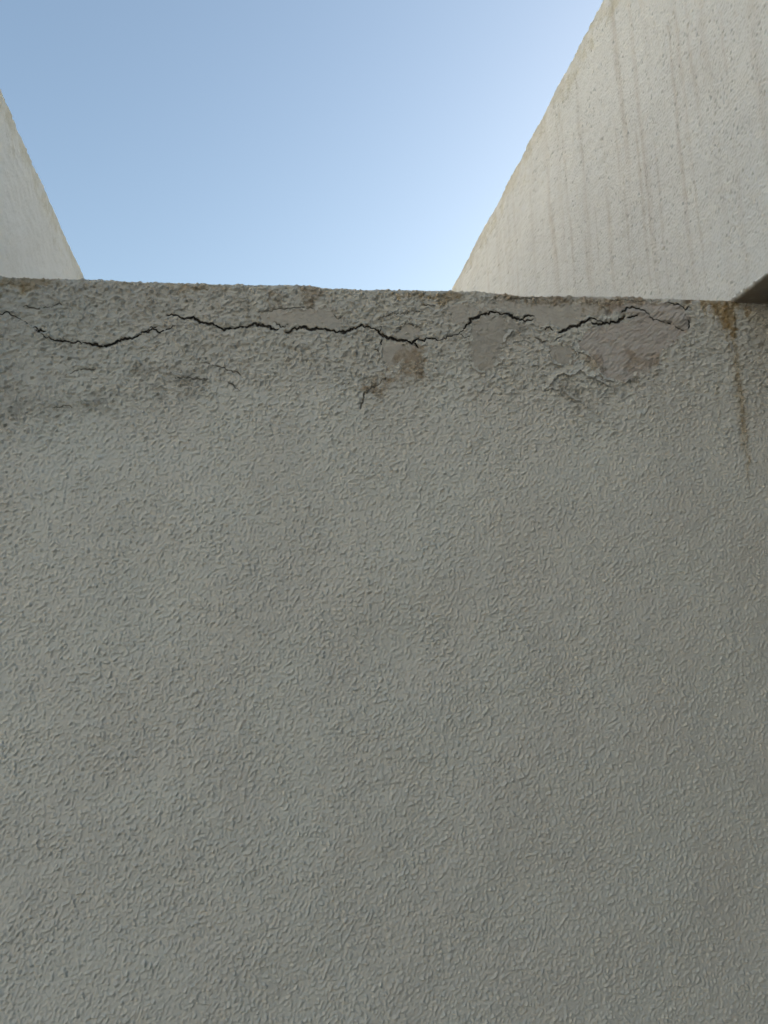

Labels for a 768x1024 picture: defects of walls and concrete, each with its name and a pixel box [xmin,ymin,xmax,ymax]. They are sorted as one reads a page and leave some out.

crack [0,297,691,375]
peeling [377,319,425,369]
peeling [446,297,689,401]